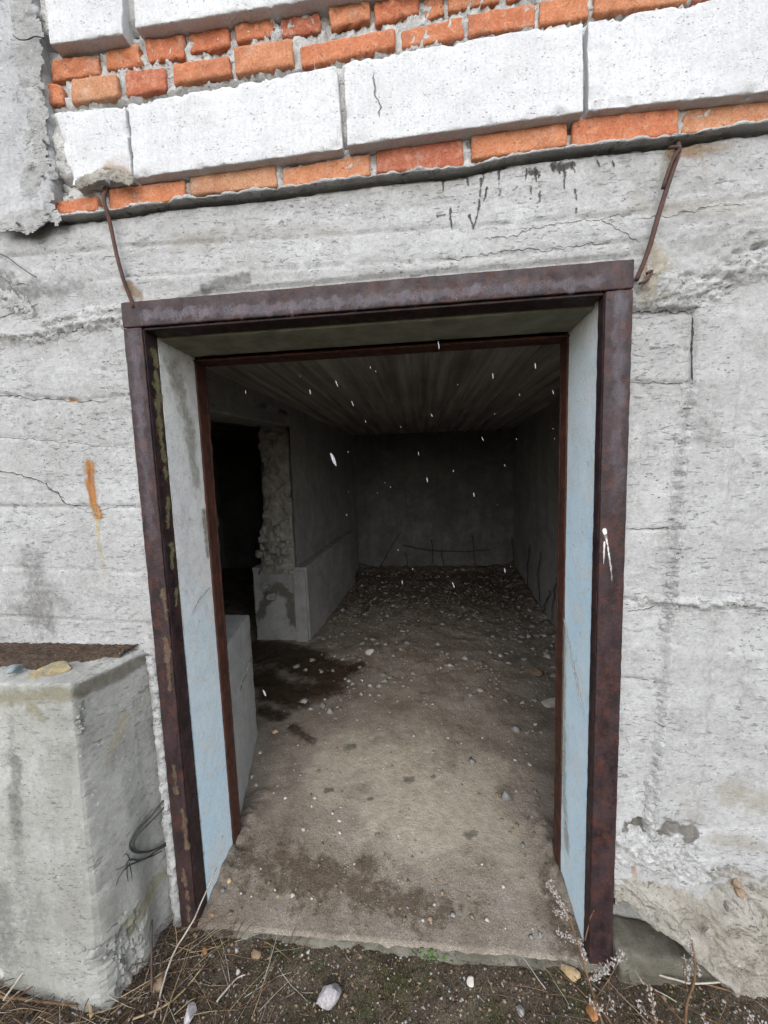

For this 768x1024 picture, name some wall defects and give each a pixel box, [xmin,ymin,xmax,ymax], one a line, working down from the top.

crack [372,73,383,116]
damp [431,151,640,229]
crack [440,203,744,261]
crack [0,469,137,516]
rust [86,460,102,519]
damp [251,641,365,741]
spalling [615,817,768,895]